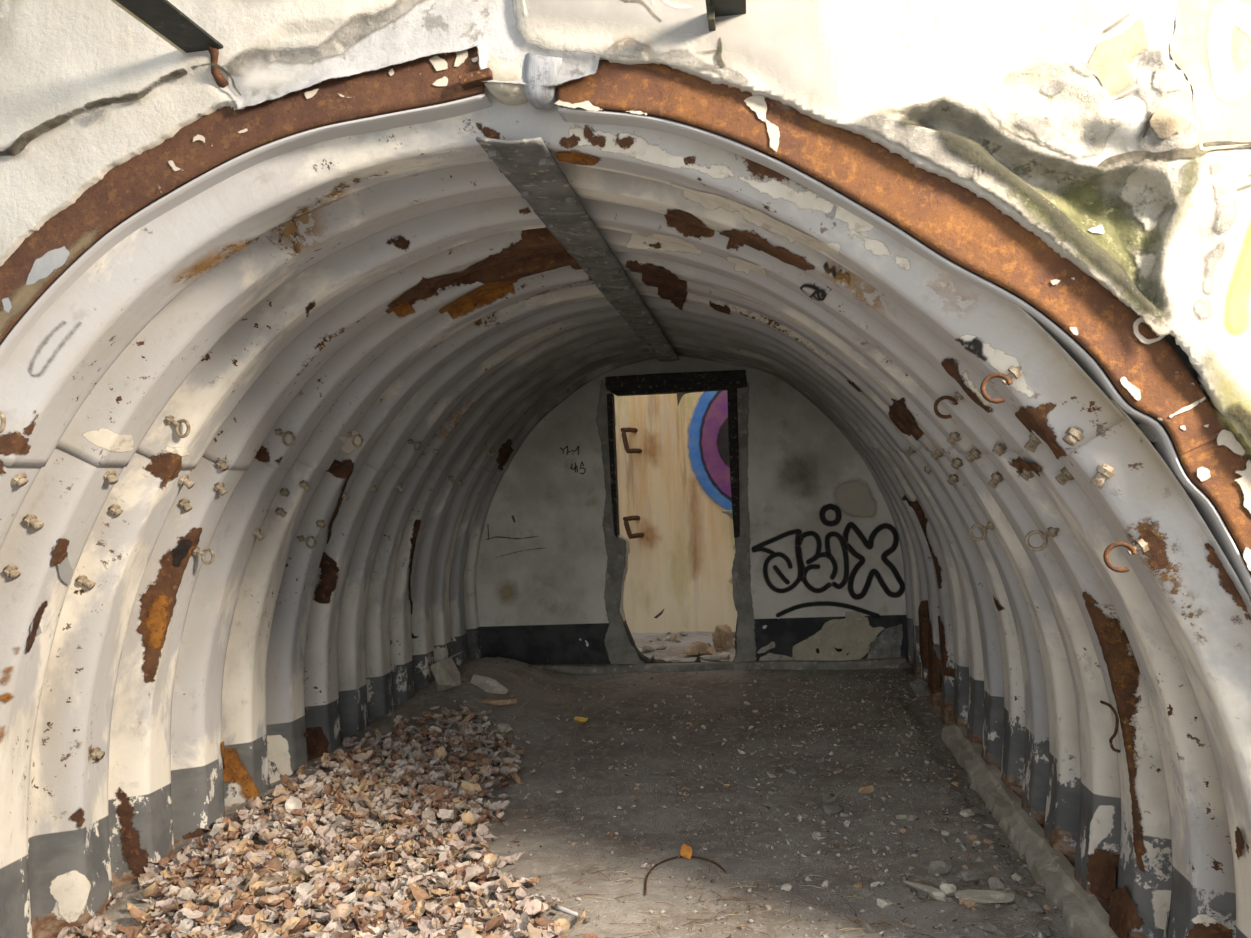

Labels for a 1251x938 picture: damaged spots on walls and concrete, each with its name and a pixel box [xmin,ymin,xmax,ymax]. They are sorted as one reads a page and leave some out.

crack [0,63,241,156]
peeling [0,230,97,336]
rust [385,227,592,326]
peeling [569,128,910,270]
rust [665,210,815,271]
spalling [855,0,1251,335]
rust [0,411,39,474]
peeling [83,428,134,452]
rust [143,451,182,487]
peeling [165,446,190,456]
rust [136,527,203,683]
rust [1082,592,1147,873]